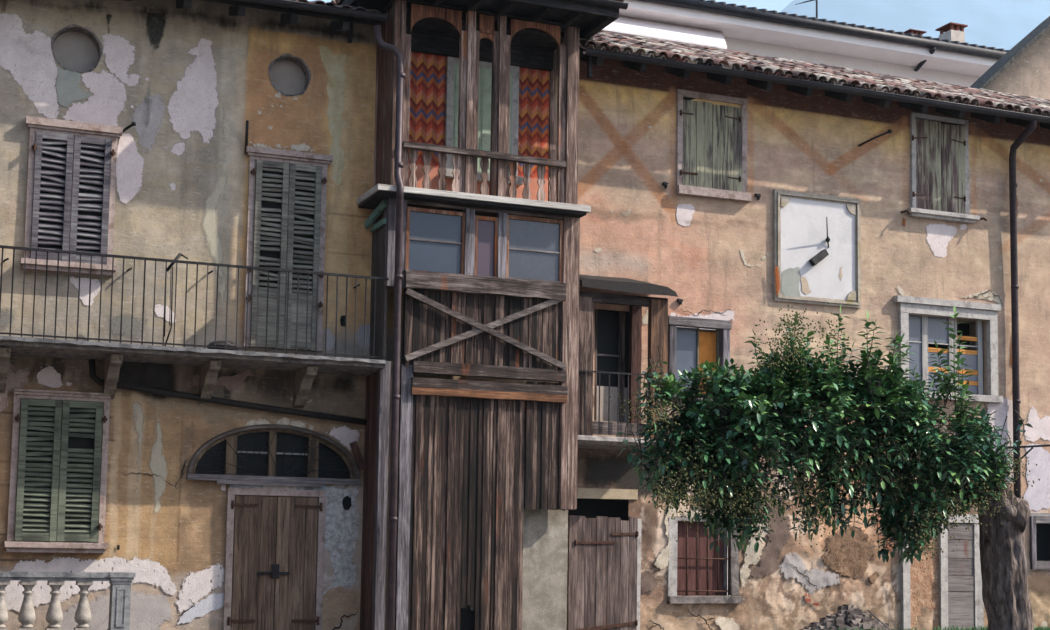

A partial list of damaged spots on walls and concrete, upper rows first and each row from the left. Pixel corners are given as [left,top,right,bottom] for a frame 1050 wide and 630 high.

peeling [0,13,219,204]
peeling [926,224,967,258]
peeling [70,276,101,310]
peeling [155,304,178,323]
spalling [0,357,72,415]
peeling [986,398,1050,512]
peeling [4,545,225,630]
peeling [323,484,360,595]
crack [333,611,358,630]
spalling [740,495,880,607]